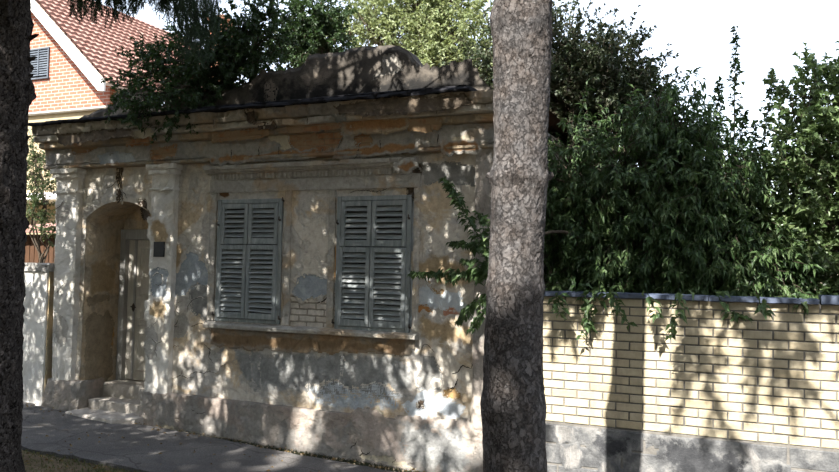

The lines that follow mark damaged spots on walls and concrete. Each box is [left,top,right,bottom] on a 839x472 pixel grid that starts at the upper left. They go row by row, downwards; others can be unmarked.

peeling [149,252,215,340]
peeling [410,279,467,332]
crack [421,343,473,392]
damp [552,424,633,472]
damp [643,433,791,472]